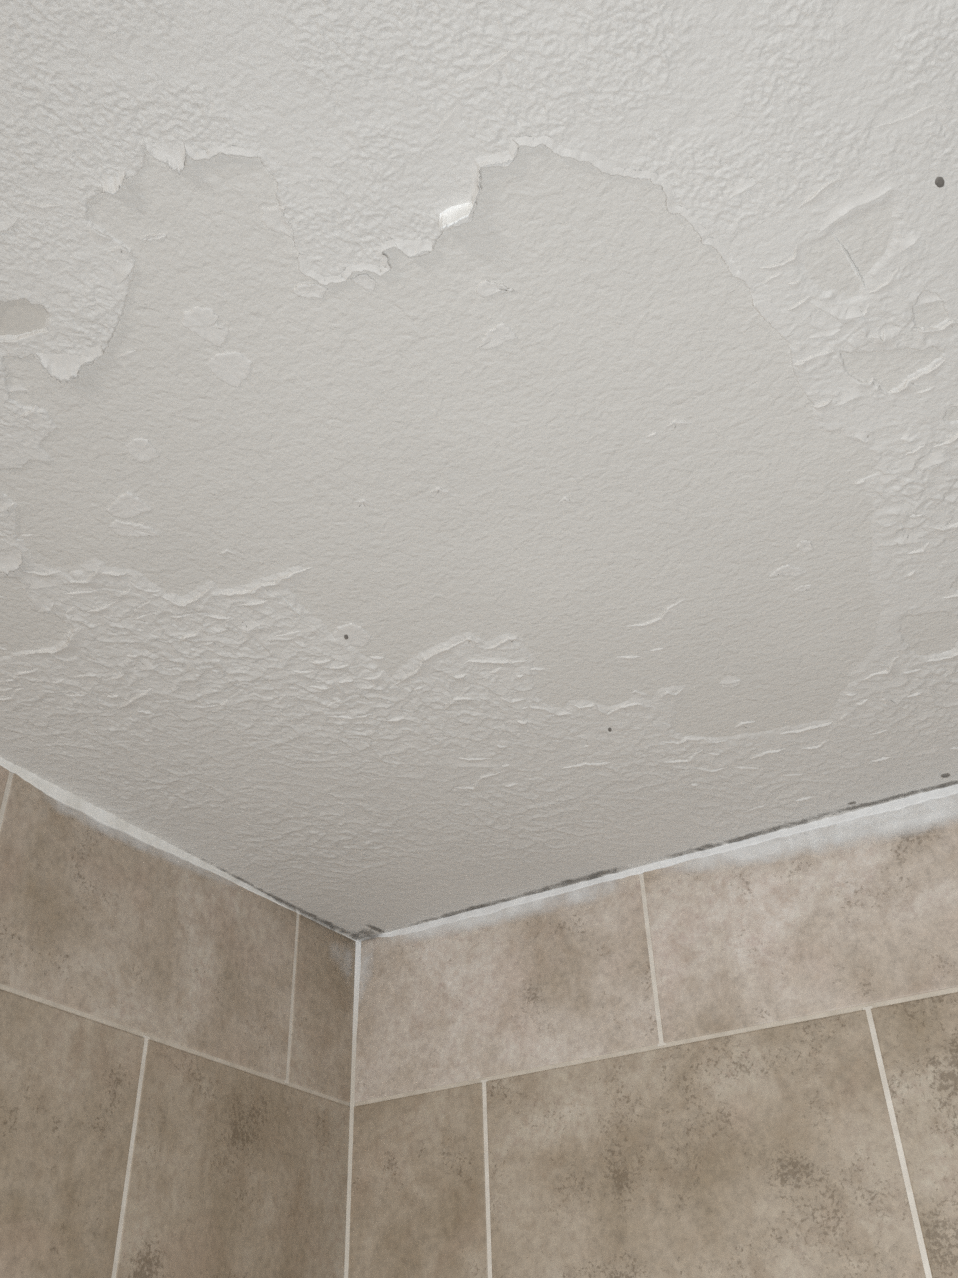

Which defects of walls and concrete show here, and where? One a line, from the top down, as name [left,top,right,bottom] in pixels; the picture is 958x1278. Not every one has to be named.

peeling [476,280,517,298]
peeling [181,306,229,348]
peeling [478,322,518,350]
peeling [333,623,373,647]
peeling [899,612,958,655]